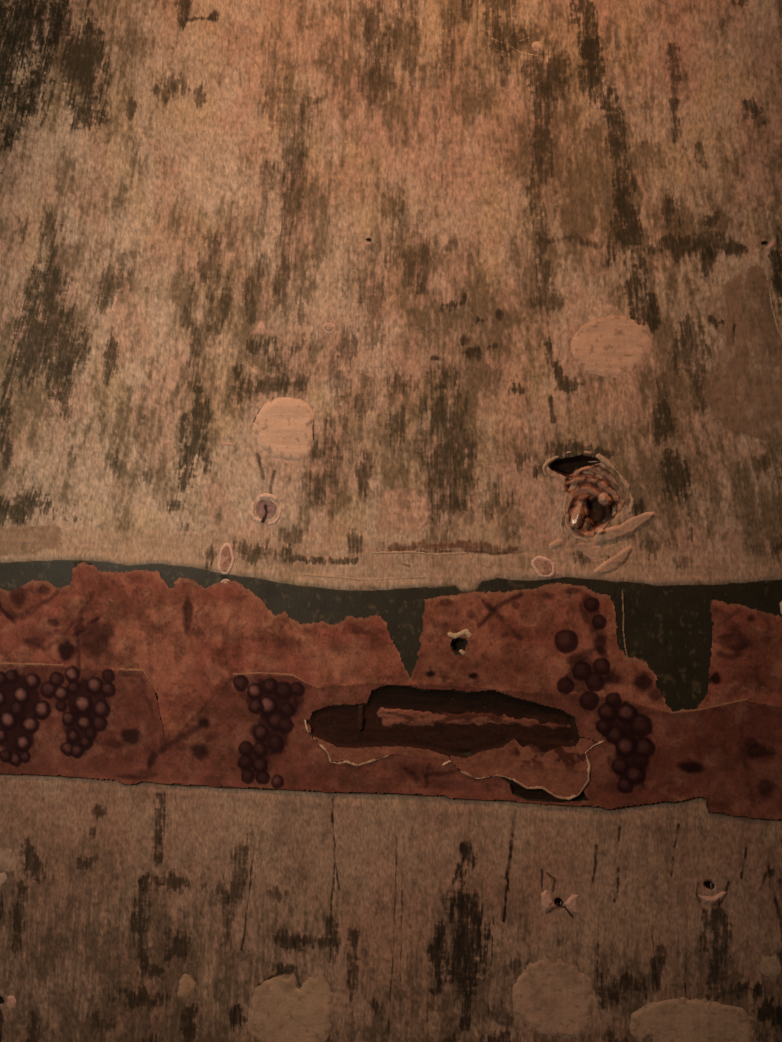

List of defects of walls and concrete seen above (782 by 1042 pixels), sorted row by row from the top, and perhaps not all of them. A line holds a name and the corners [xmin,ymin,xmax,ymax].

leakage [0,0,110,151]
leakage [463,0,748,332]
leakage [0,258,89,469]
leakage [167,382,212,512]
spalling [250,493,281,525]
leakage [544,341,579,423]
peeling [0,560,74,591]
peeling [92,561,428,677]
spalling [448,629,472,639]
peeling [481,440,782,712]
leakage [428,843,494,1042]
flaking render [541,869,579,917]